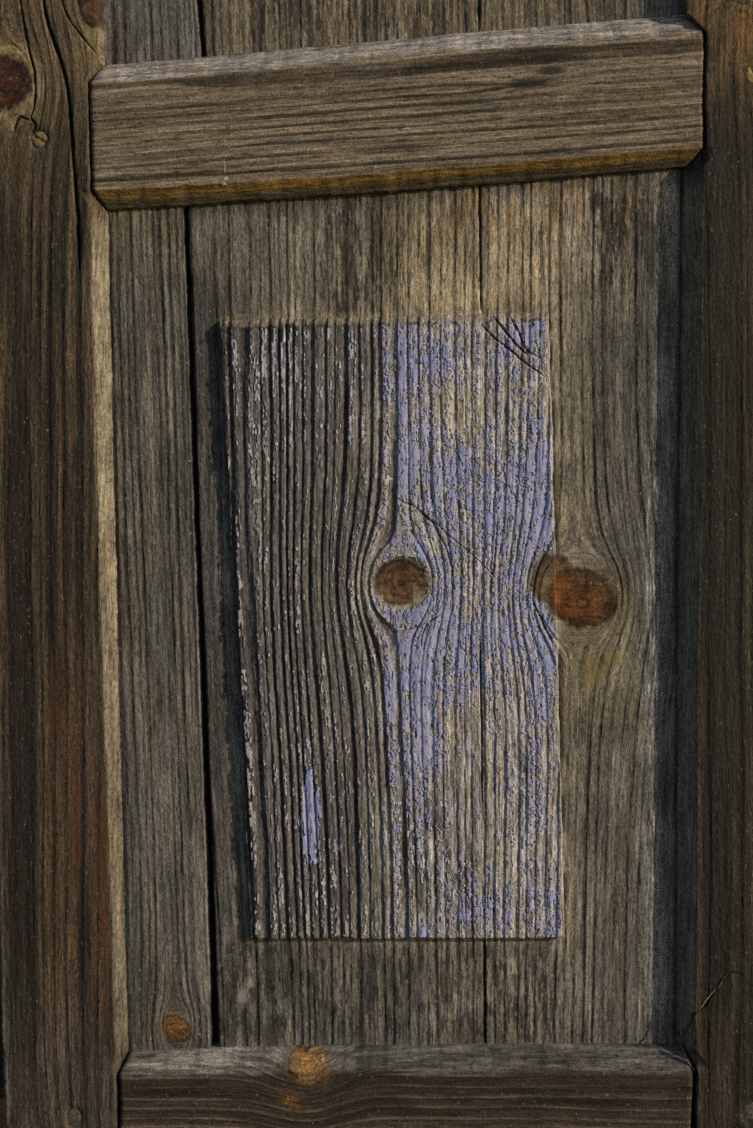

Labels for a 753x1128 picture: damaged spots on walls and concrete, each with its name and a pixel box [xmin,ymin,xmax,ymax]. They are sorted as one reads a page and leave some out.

crack [478,191,540,373]
peeling [226,321,563,938]
crack [477,644,485,793]
crack [480,941,488,1042]
crack [678,972,737,1075]